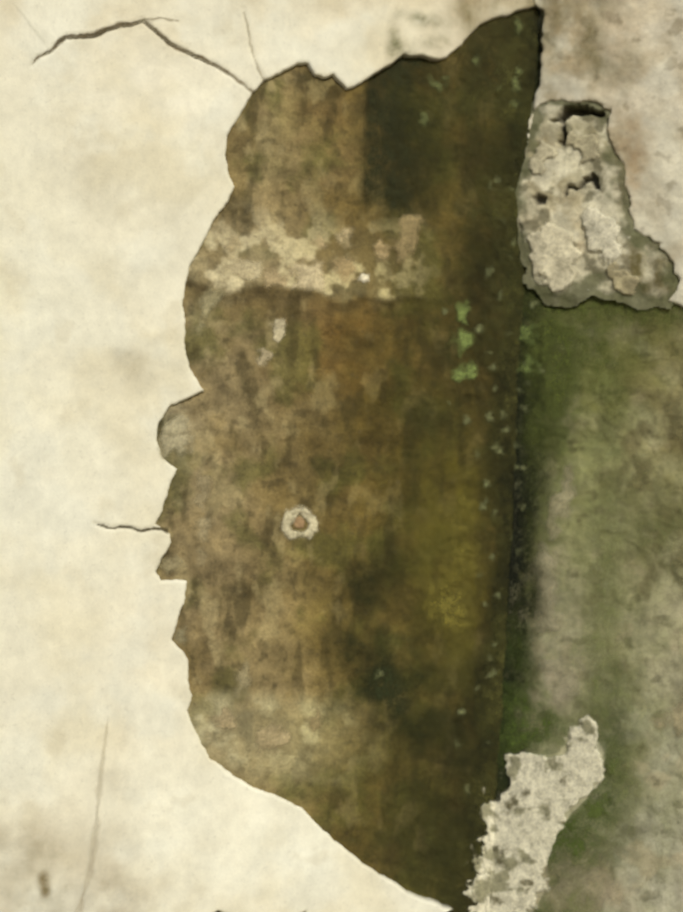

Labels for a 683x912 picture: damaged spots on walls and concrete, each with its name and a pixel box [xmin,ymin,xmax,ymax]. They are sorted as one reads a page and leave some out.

crack [34,20,252,91]
spalling [156,8,683,912]
crack [98,524,168,533]